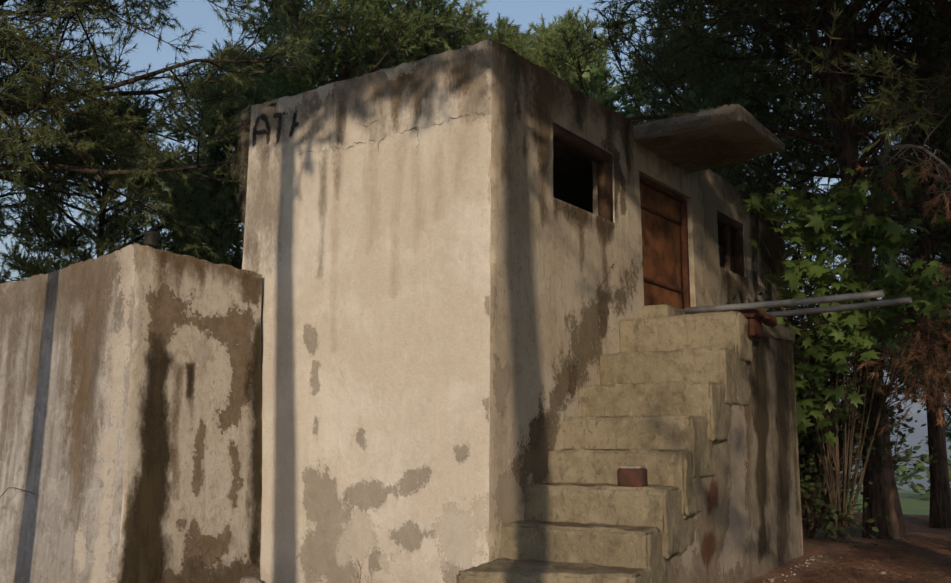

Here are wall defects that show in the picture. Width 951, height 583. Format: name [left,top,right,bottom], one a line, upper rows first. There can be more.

damp [721,191,786,327]
damp [65,262,111,521]
peeling [74,245,262,583]
peeling [331,509,393,583]
damp [740,336,799,562]